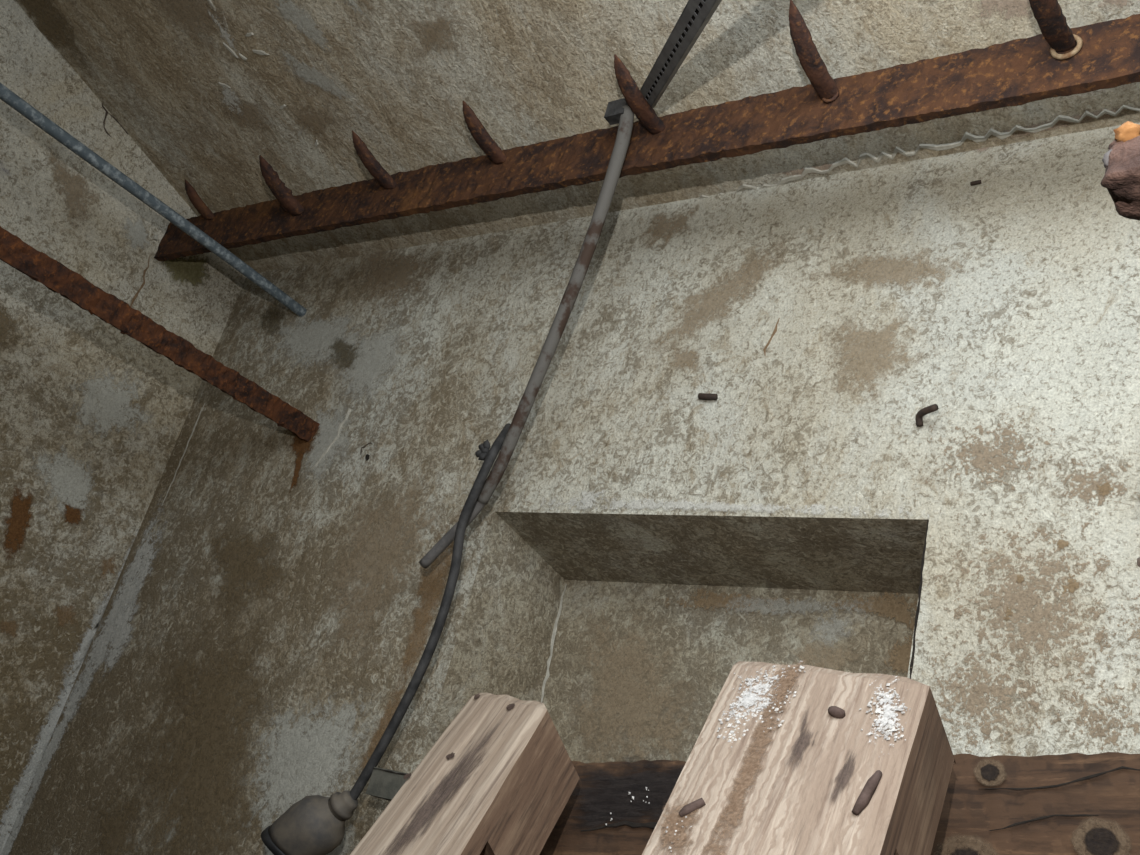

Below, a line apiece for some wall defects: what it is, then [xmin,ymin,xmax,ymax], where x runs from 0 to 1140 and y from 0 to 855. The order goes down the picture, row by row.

rust [0,226,320,491]
rust [4,488,33,558]
rust [65,504,81,524]
leakage [0,519,164,855]
leakage [94,630,364,855]